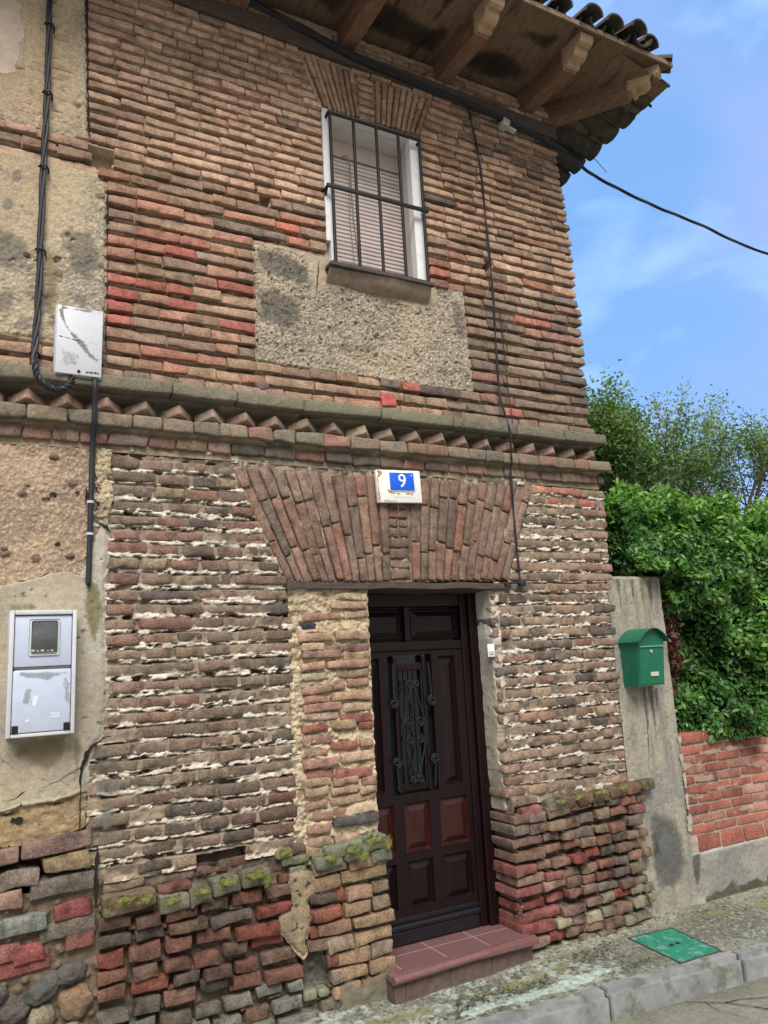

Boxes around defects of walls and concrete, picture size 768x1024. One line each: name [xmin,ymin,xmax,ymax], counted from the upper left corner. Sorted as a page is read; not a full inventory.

water stain [369,4,446,52]
water stain [469,53,522,79]
water stain [259,250,307,280]
water stain [262,291,299,326]
crack [3,736,111,831]
water stain [652,816,700,884]
water stain [706,879,768,902]